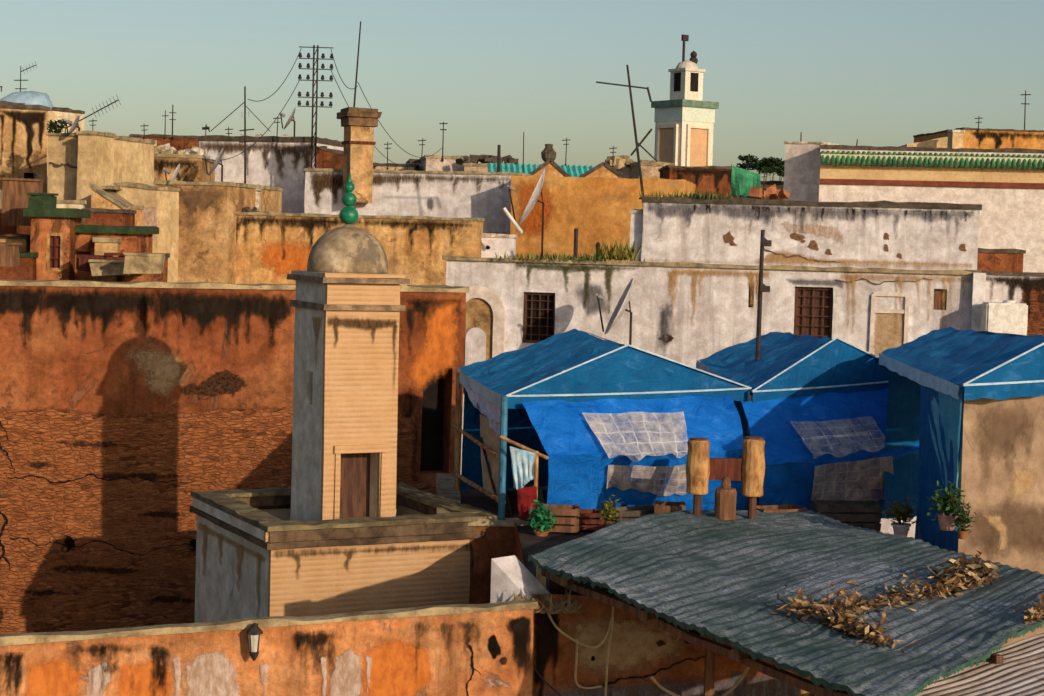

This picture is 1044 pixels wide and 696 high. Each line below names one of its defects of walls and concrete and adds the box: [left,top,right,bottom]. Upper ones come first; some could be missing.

water stain [0,111,46,168]
water stain [201,142,343,258]
water stain [357,199,464,247]
spalling [723,231,737,246]
peeling [784,222,843,255]
water stain [0,289,290,345]
water stain [661,252,970,344]
crack [0,421,194,486]
spalling [396,415,436,495]
spalling [0,370,293,635]
crack [0,511,191,570]
crack [466,627,481,696]